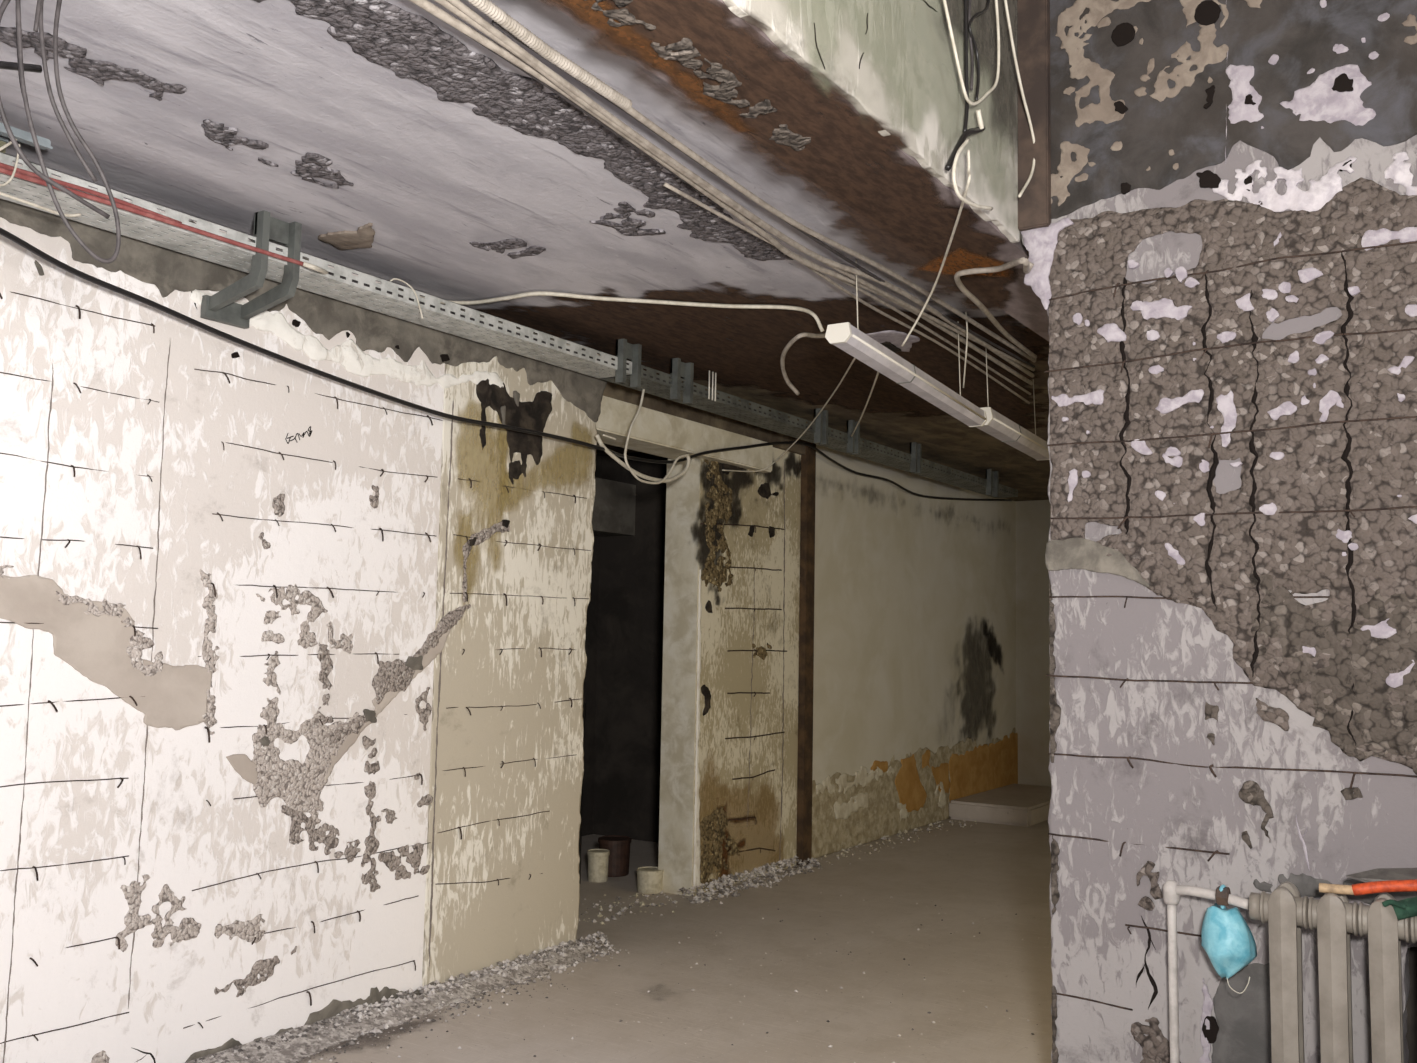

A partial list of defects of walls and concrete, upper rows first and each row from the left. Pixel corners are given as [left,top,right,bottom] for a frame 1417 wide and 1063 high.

peeling [0,198,607,484]
leakage [455,403,591,593]
spalling [290,0,794,261]
rust [476,0,1049,429]
crack [1119,277,1131,534]
spalling [1021,0,1417,775]
crack [1201,274,1261,677]
crack [1341,252,1356,633]
peeling [0,565,220,735]
spalling [226,520,510,892]
leakage [983,621,1002,666]
crack [1136,916,1158,1009]